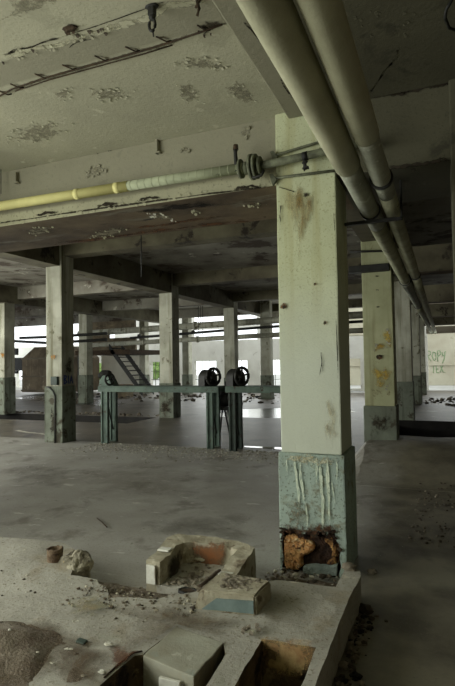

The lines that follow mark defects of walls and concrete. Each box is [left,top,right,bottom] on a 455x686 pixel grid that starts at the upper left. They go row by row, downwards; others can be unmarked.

spalling [10,0,204,61]
spalling [0,24,228,97]
crack [370,48,448,98]
spalling [0,184,266,236]
efflorescence [286,454,338,528]
spalling [279,494,342,576]